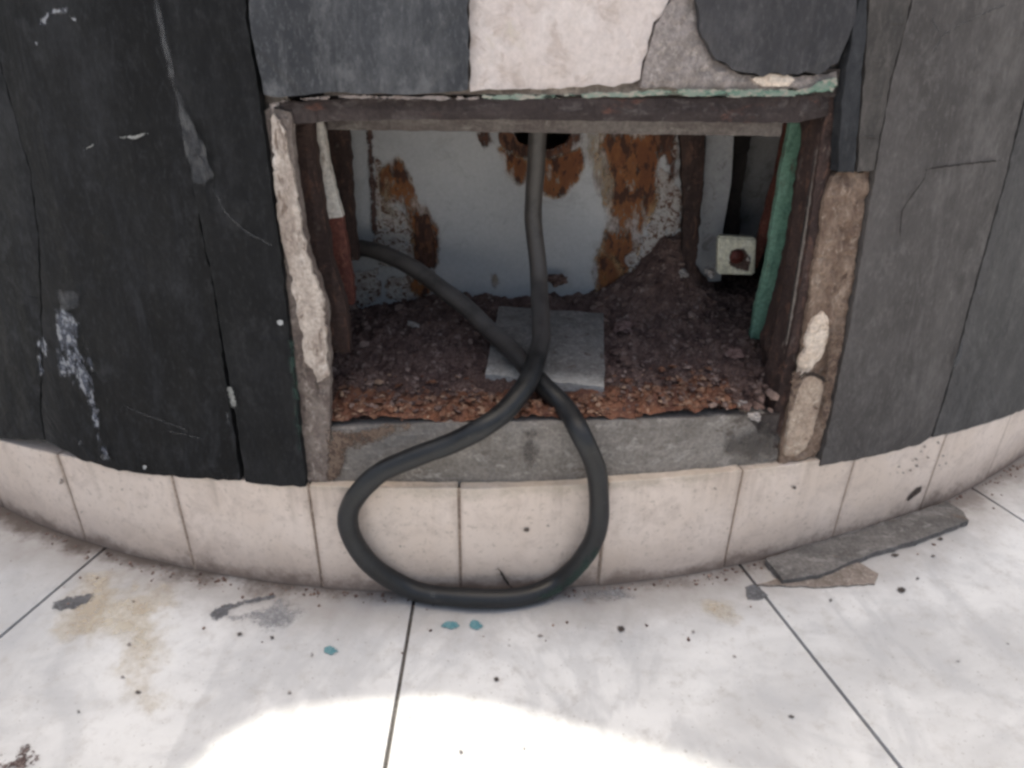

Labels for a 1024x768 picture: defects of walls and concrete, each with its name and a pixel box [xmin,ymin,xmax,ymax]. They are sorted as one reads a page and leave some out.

peeling [271,113,331,382]
peeling [373,159,415,259]
corrosion [366,130,439,269]
corrosion [477,132,528,186]
corrosion [543,133,678,291]
peeling [624,140,682,272]
crack [900,160,1000,237]
spalling [776,171,870,464]